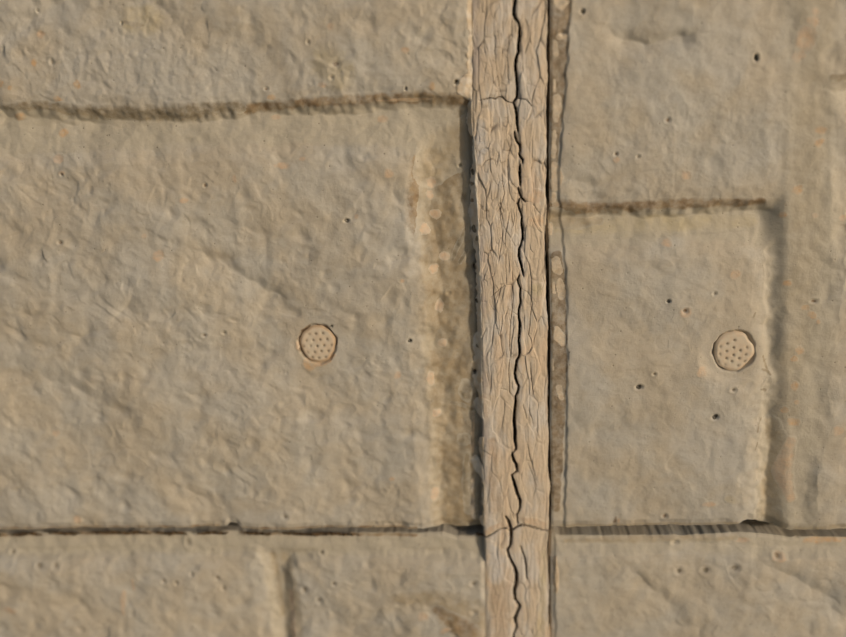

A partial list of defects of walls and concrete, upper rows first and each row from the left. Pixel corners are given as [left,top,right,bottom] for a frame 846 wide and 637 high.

peeling [553,0,570,11]
peeling [552,34,568,57]
peeling [549,79,565,204]
peeling [550,256,566,300]
crack [476,0,552,637]
peeling [553,326,566,346]